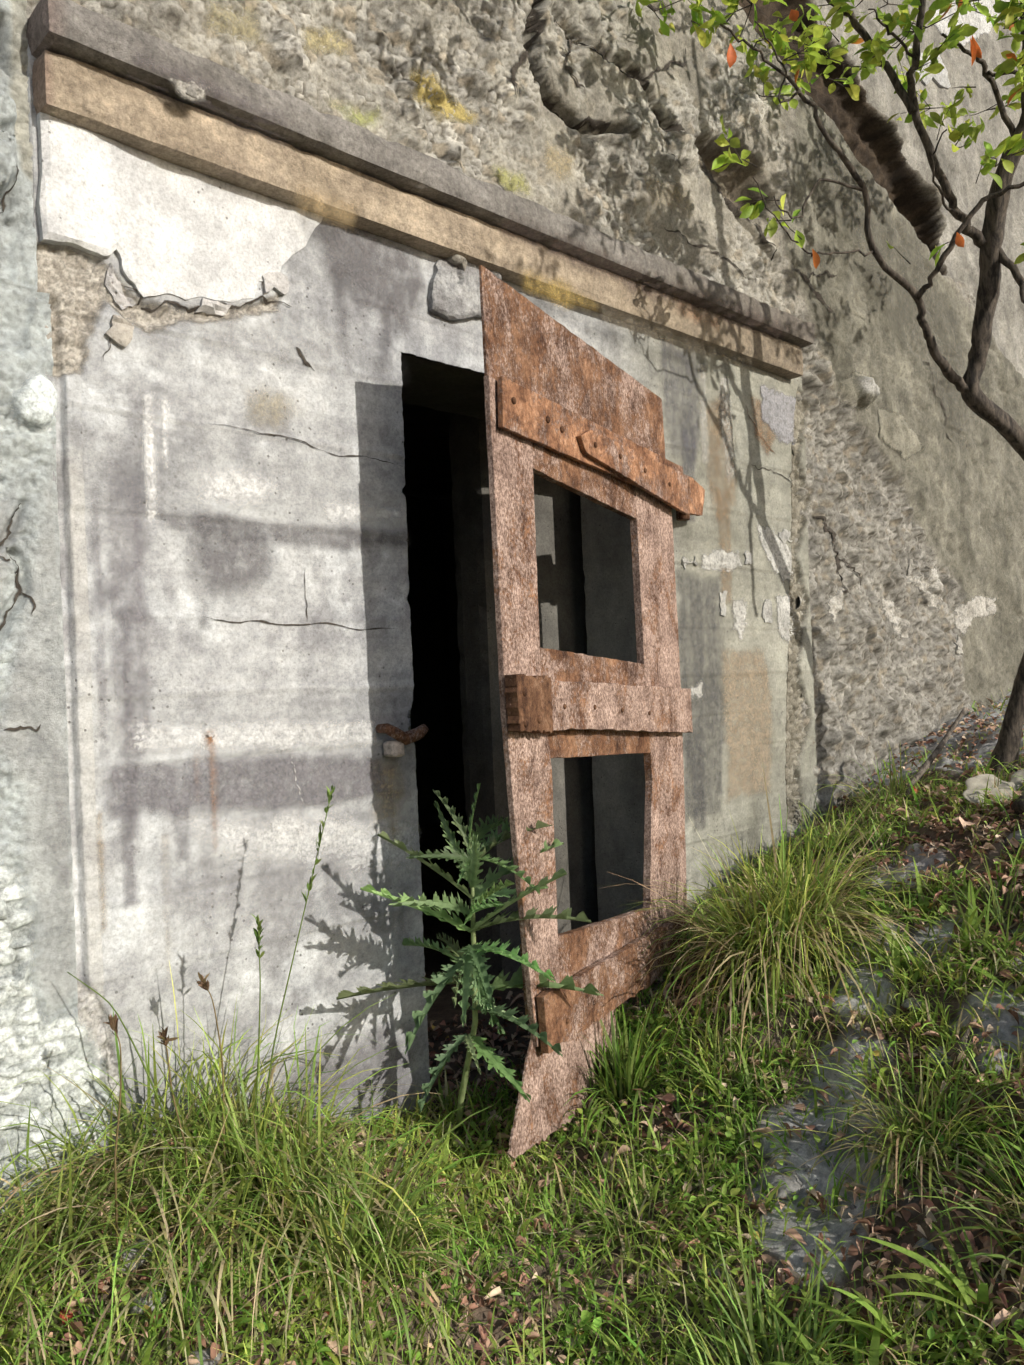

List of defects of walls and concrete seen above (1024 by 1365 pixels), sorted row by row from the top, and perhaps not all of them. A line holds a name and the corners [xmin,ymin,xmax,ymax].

crack [510,0,687,134]
peeling [36,112,323,377]
crack [664,160,837,320]
crack [0,503,36,631]
crack [207,572,394,630]
spalling [681,385,812,826]
peeling [828,590,844,624]
leakage [111,724,411,866]